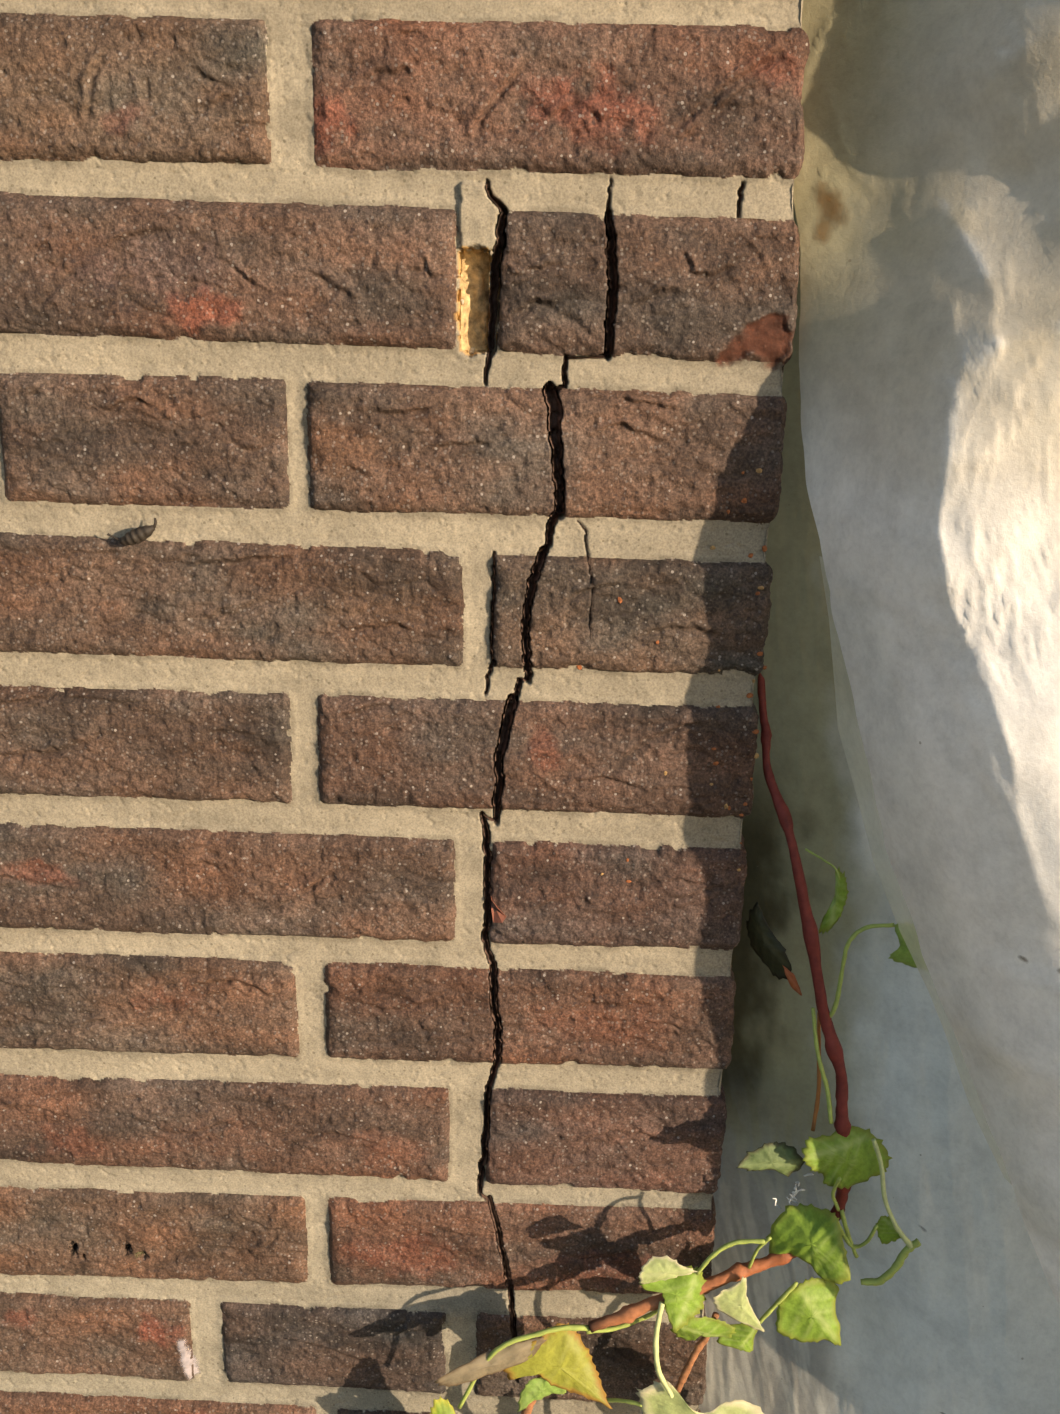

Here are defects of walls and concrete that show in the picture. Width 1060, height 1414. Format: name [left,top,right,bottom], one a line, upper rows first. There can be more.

crack [478,181,617,1337]
spalling [717,314,791,367]